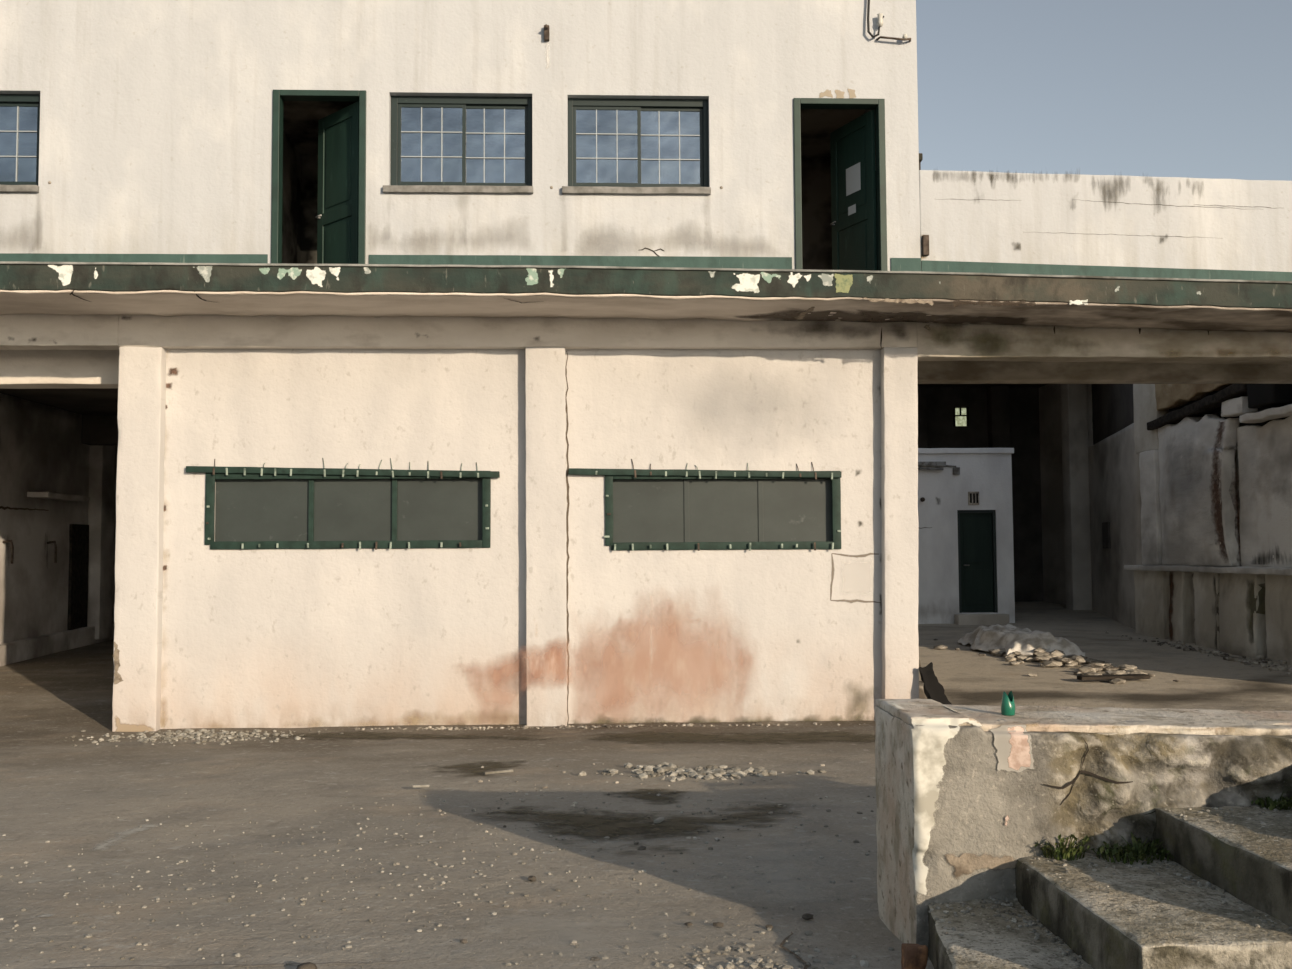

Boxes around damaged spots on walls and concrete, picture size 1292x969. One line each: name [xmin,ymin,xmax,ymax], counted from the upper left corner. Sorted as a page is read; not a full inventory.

peeling [48,265,73,286]
peeling [259,267,340,287]
peeling [732,271,933,305]
leakage [739,310,1026,352]
rust [1212,417,1240,557]
crack [1043,739,1133,805]
leakage [491,789,794,853]